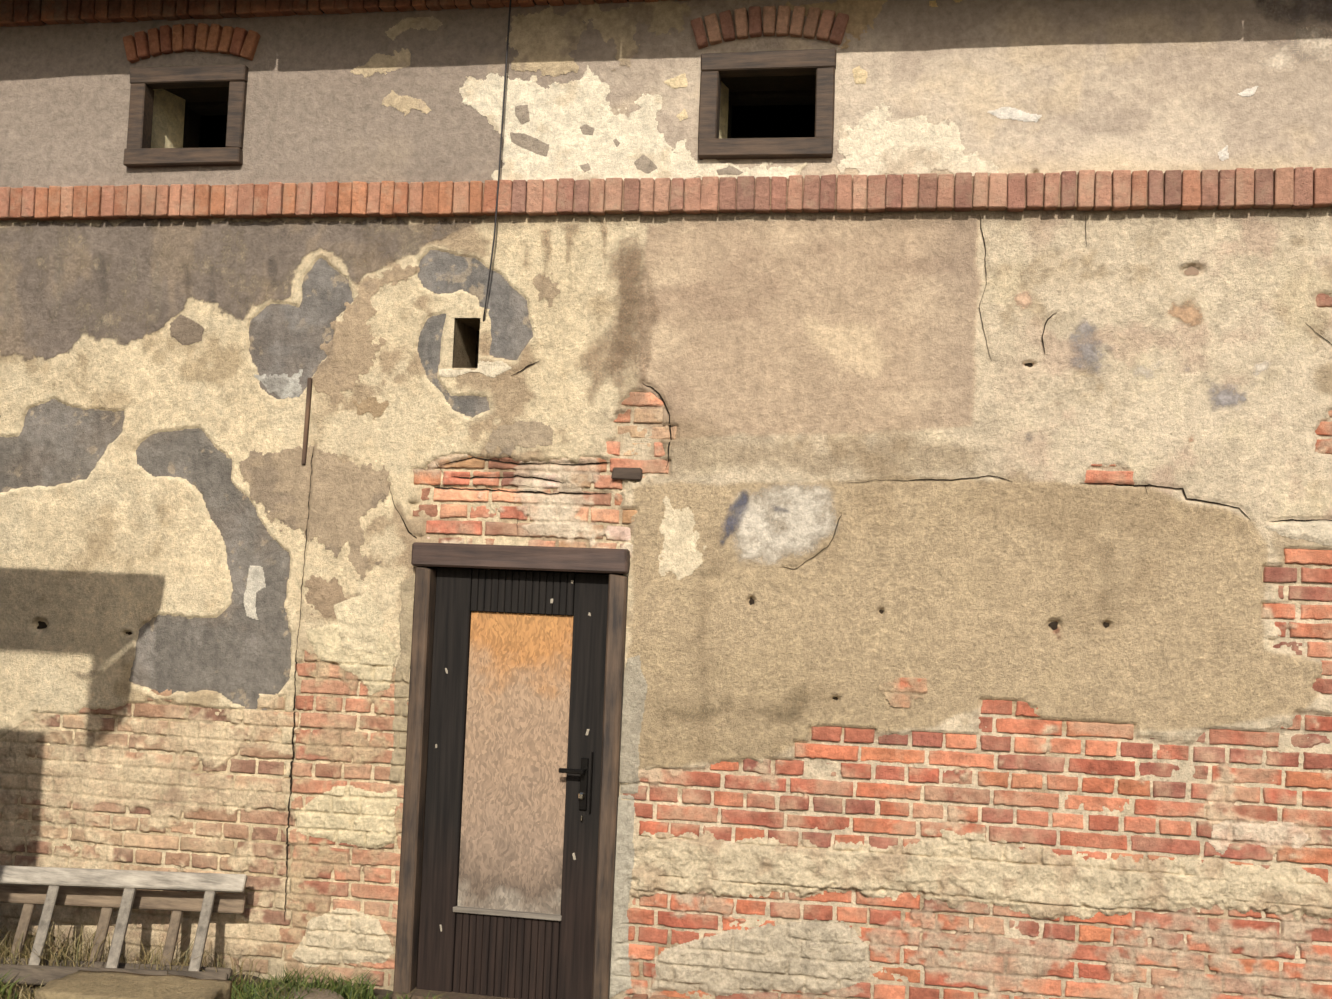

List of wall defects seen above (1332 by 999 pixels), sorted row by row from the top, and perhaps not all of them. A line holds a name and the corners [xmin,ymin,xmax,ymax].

flaking render [459,0,807,182]
flaking render [248,250,561,420]
crack [979,218,992,361]
flaking render [0,399,125,492]
flaking render [413,392,677,558]
flaking render [658,496,707,580]
crack [1080,482,1332,522]
flaking render [1315,410,1332,454]
flaking render [1261,548,1332,694]
flaking render [0,428,410,989]
flaking render [623,700,1332,882]
flaking render [622,890,1332,999]